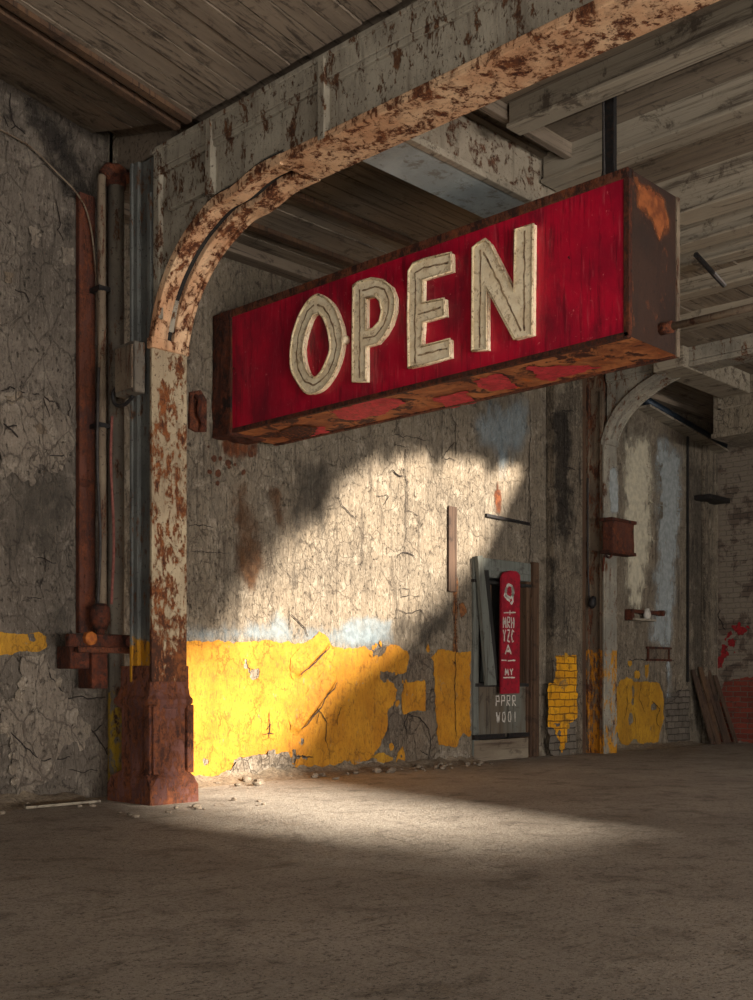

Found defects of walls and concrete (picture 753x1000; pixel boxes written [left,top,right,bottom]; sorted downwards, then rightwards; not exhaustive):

leakage [552,411,573,539]
leakage [238,486,262,586]
flaking render [0,654,91,795]
crack [11,725,108,773]
crack [49,672,106,700]
spalling [242,658,260,680]
flaking render [216,735,309,777]
crack [293,709,341,766]
peeling [359,641,470,762]
crack [404,713,431,756]
flaking render [547,719,578,756]
flaking render [719,677,753,743]